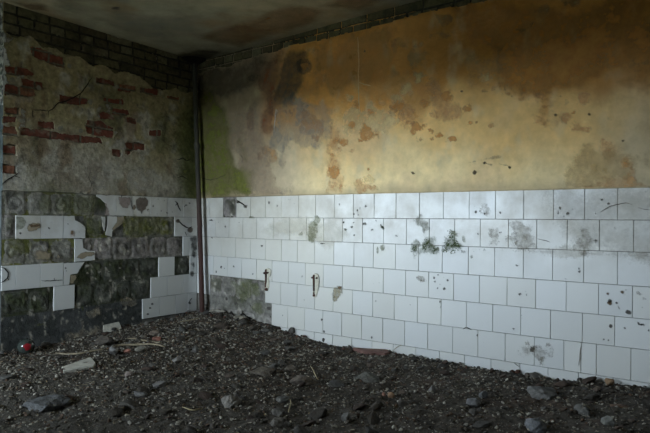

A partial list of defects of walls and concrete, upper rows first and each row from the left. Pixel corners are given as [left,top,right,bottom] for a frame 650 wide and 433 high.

spalling [2,0,487,144]
crack [32,78,92,117]
leakage [272,52,327,135]
spalling [2,144,23,174]
spalling [112,142,144,157]
peeling [0,191,327,355]
spalling [370,350,605,387]